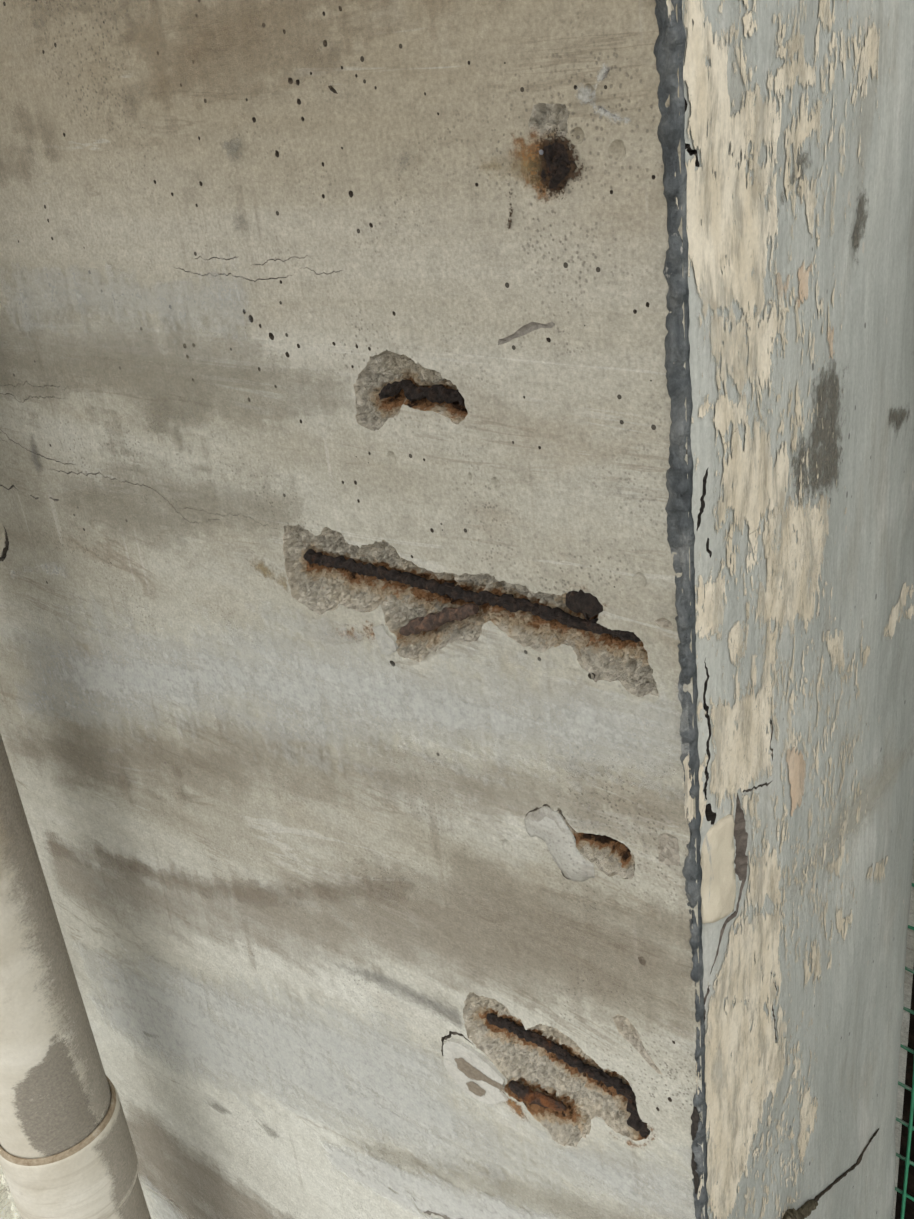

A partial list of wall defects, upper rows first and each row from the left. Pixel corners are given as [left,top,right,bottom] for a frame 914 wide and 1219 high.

rust [511,128,586,199]
spalling [353,350,468,431]
spalling [282,524,659,697]
peeling [666,0,890,1219]
peeling [884,582,914,639]
spalling [557,807,635,880]
spalling [443,992,653,1147]
crack [408,1192,462,1219]